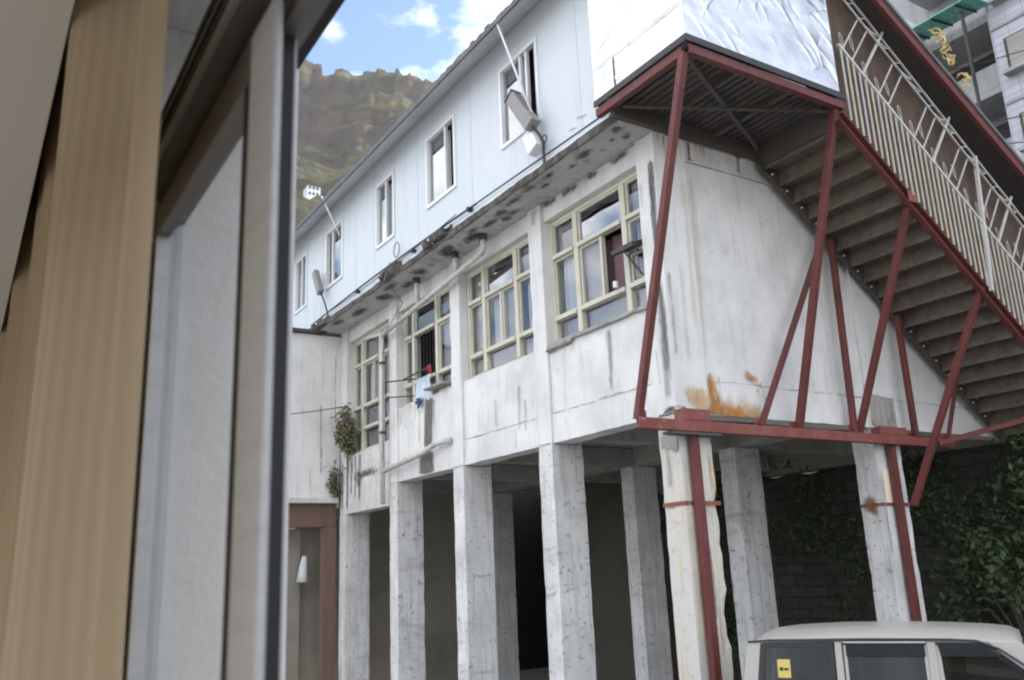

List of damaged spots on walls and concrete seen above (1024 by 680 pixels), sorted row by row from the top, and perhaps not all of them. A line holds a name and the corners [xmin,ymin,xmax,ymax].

leakage [610,127,630,164]
leakage [466,174,552,244]
leakage [640,161,656,244]
leakage [376,270,425,301]
rust [689,373,761,419]
rust [864,497,877,514]